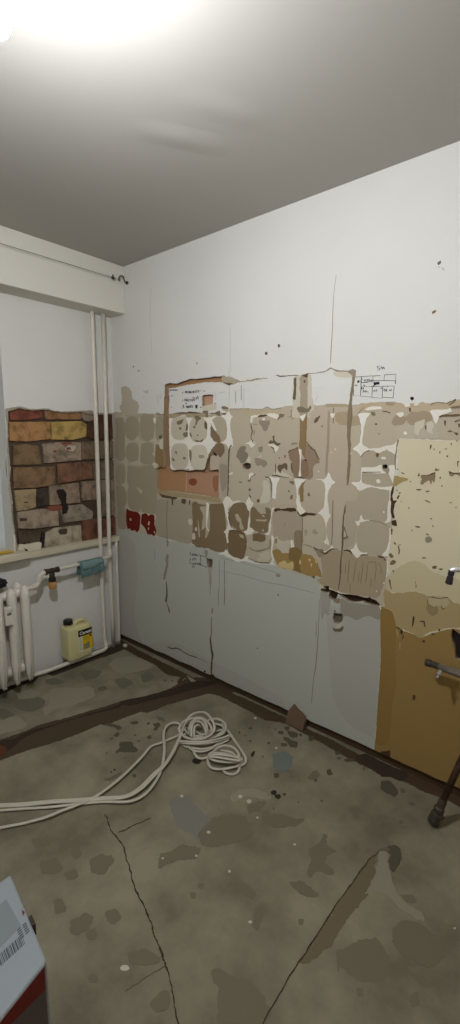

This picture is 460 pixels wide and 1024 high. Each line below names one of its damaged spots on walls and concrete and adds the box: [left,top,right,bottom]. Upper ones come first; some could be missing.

flaking render [4,374,460,607]
crack [167,279,400,674]
flaking render [333,369,356,378]
flaking render [396,616,460,658]
crack [105,814,179,1024]
crack [262,851,379,1024]